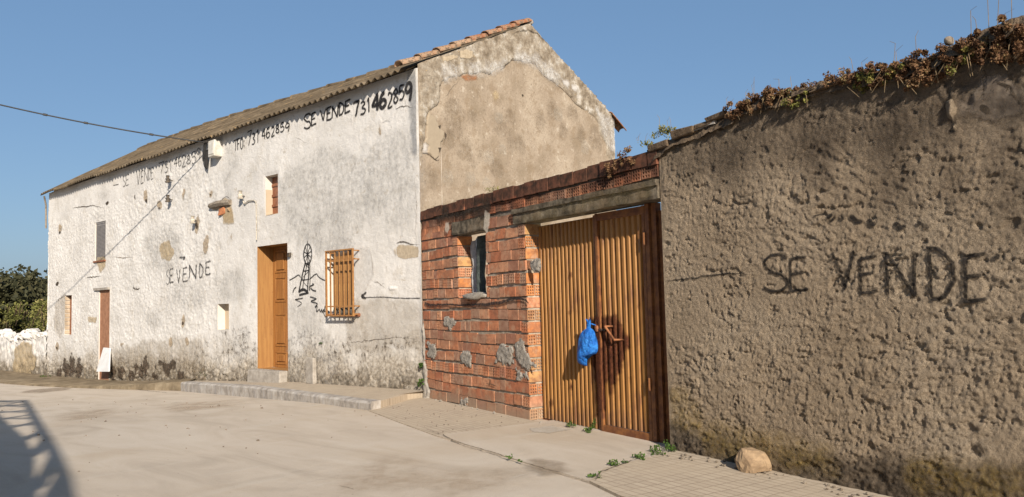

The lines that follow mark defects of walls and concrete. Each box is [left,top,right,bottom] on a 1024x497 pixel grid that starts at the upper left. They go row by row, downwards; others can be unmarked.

peeling [418,24,615,175]
spalling [208,191,234,223]
peeling [397,241,419,259]
water stain [670,422,741,463]
water stain [765,451,1024,497]